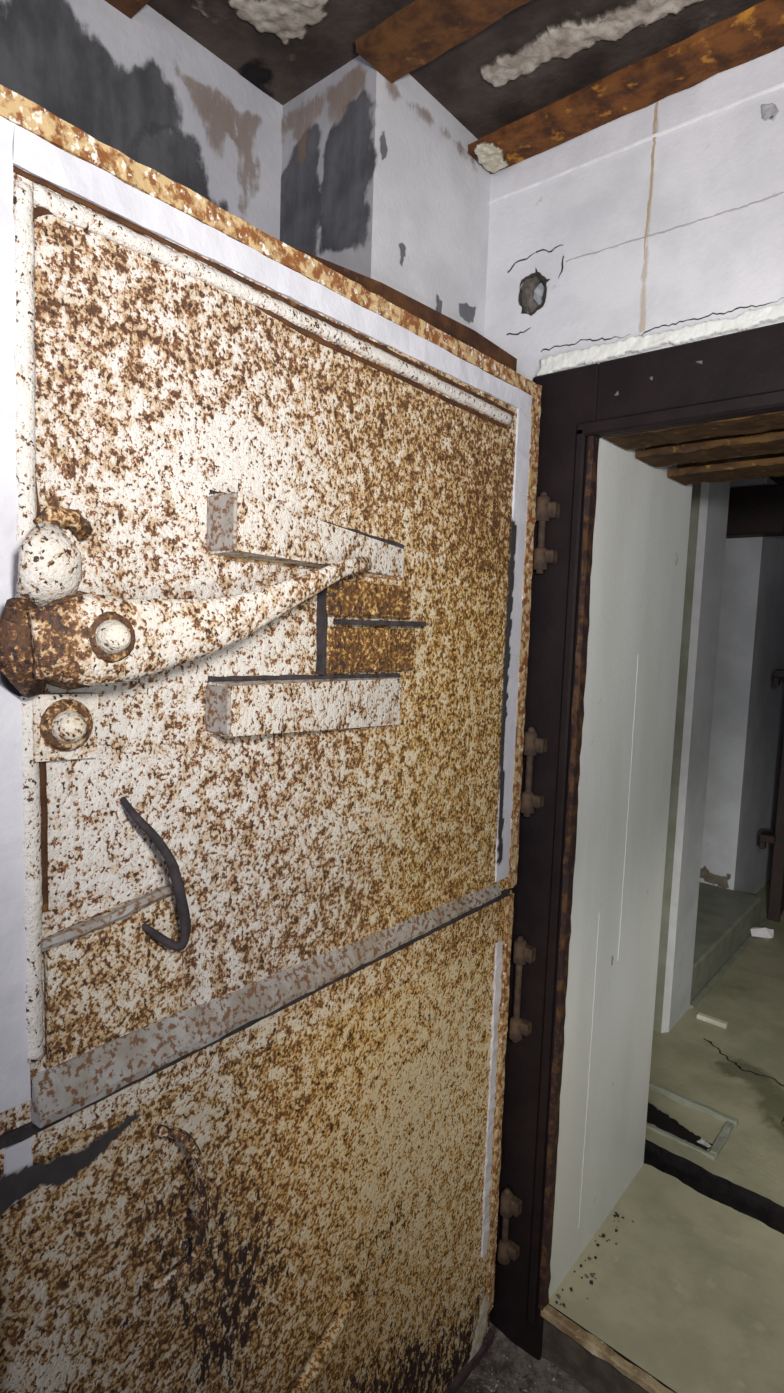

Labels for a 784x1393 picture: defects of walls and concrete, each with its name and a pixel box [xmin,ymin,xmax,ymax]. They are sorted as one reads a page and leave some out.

corrosion [644,101,659,259]
hole [507,245,564,335]
crack [704,1038,784,1127]